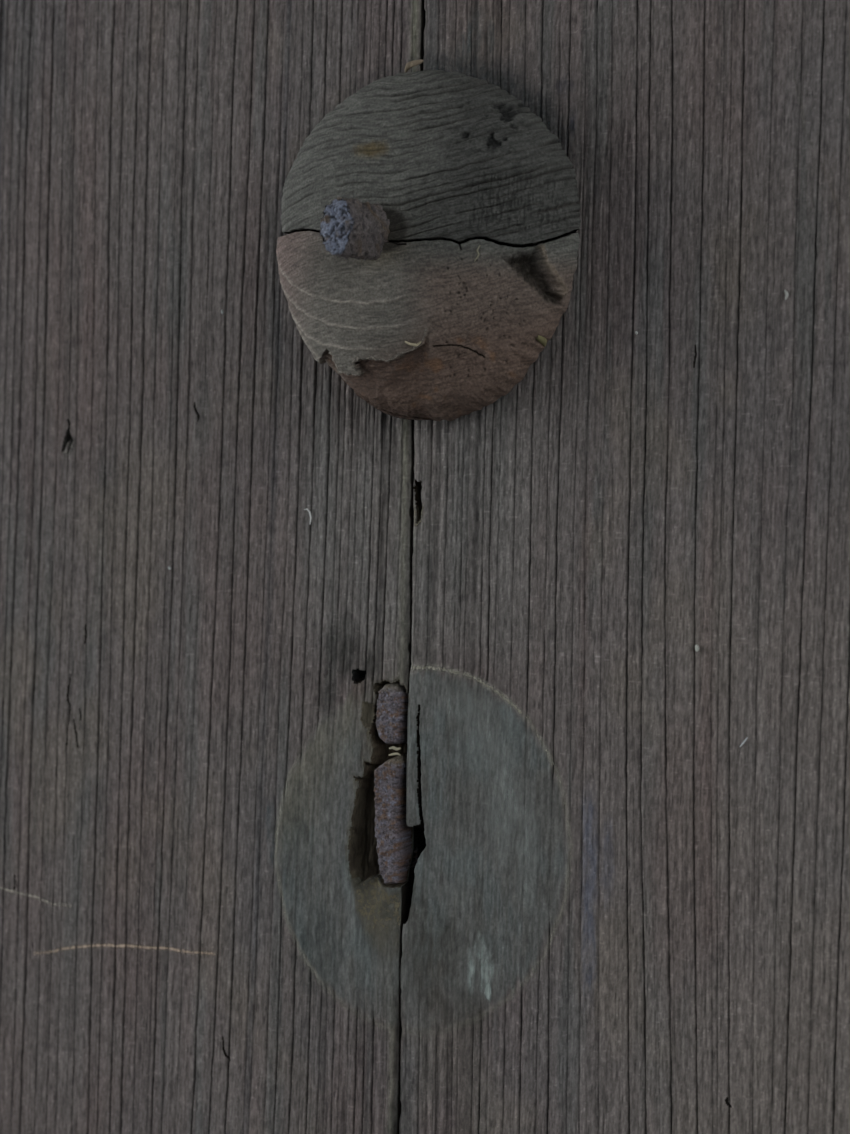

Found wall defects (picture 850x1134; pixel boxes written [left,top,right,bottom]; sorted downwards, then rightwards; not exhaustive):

crack [283,227,320,235]
crack [388,229,578,250]
spalling [347,679,413,889]
rust [374,754,418,884]